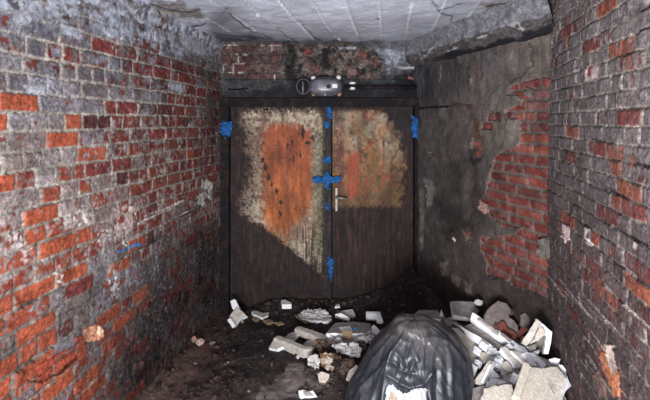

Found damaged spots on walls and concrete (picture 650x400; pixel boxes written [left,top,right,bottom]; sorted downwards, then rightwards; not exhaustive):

damp [197,180,213,207]
flaking render [462,74,551,299]
damp [67,209,91,229]
damp [97,200,184,247]
damp [8,231,32,261]